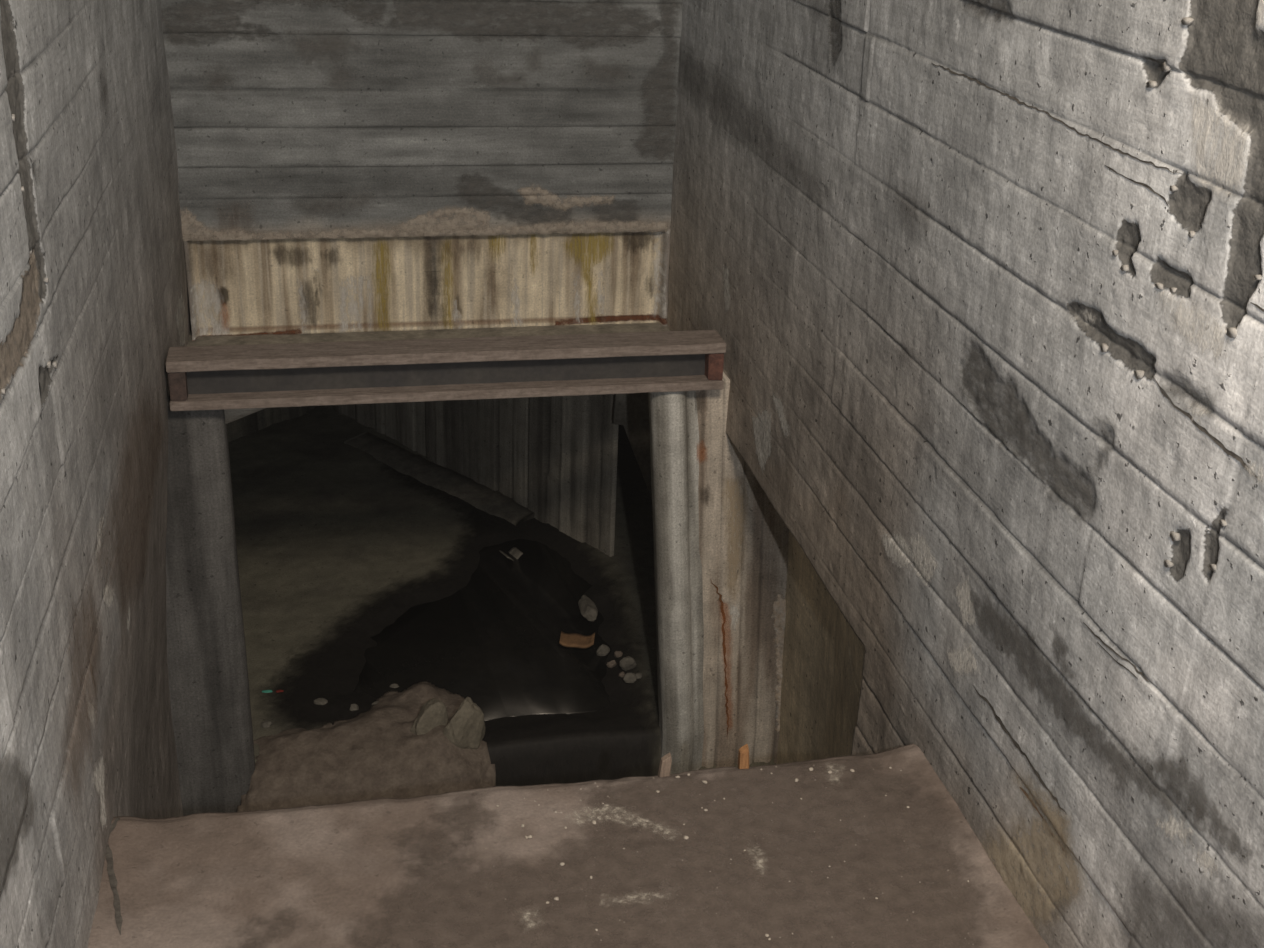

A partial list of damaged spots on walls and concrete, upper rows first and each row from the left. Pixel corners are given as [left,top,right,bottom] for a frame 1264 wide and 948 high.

spalling [0,0,49,399]
leakage [566,233,612,322]
crack [932,63,1182,207]
spalling [1067,302,1155,380]
spalling [1112,219,1140,277]
spalling [1143,0,1264,338]
crack [1153,377,1263,482]
leakage [883,534,937,584]
spalling [1164,507,1229,582]
leakage [956,582,1240,852]
leakage [0,755,34,895]
leakage [987,776,1079,920]